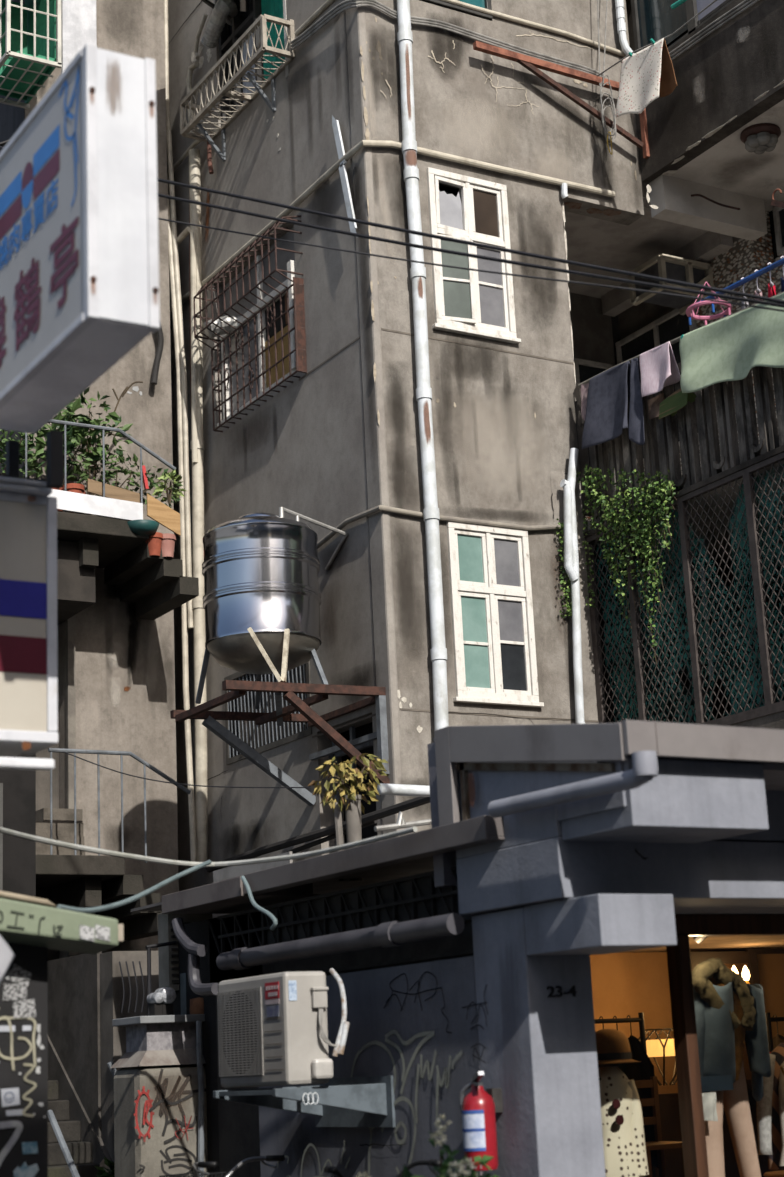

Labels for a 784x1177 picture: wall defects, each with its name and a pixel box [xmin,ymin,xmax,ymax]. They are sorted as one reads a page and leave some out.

crack [428,32,592,113]